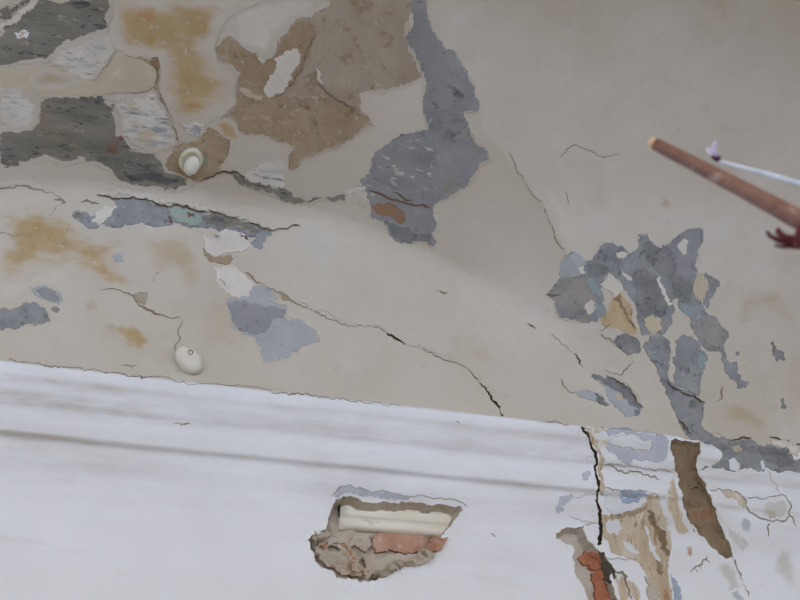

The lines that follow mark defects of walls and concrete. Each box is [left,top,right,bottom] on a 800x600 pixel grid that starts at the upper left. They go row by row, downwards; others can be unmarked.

damp [109,0,260,141]
flaking render [0,0,493,250]
damp [0,202,207,303]
peeling [0,285,65,331]
crack [101,272,183,351]
crack [8,358,400,406]
peeling [223,272,323,366]
crack [277,291,505,416]
peeling [544,226,800,600]
flaking render [304,484,468,591]
crack [543,420,608,546]
crack [700,470,796,537]